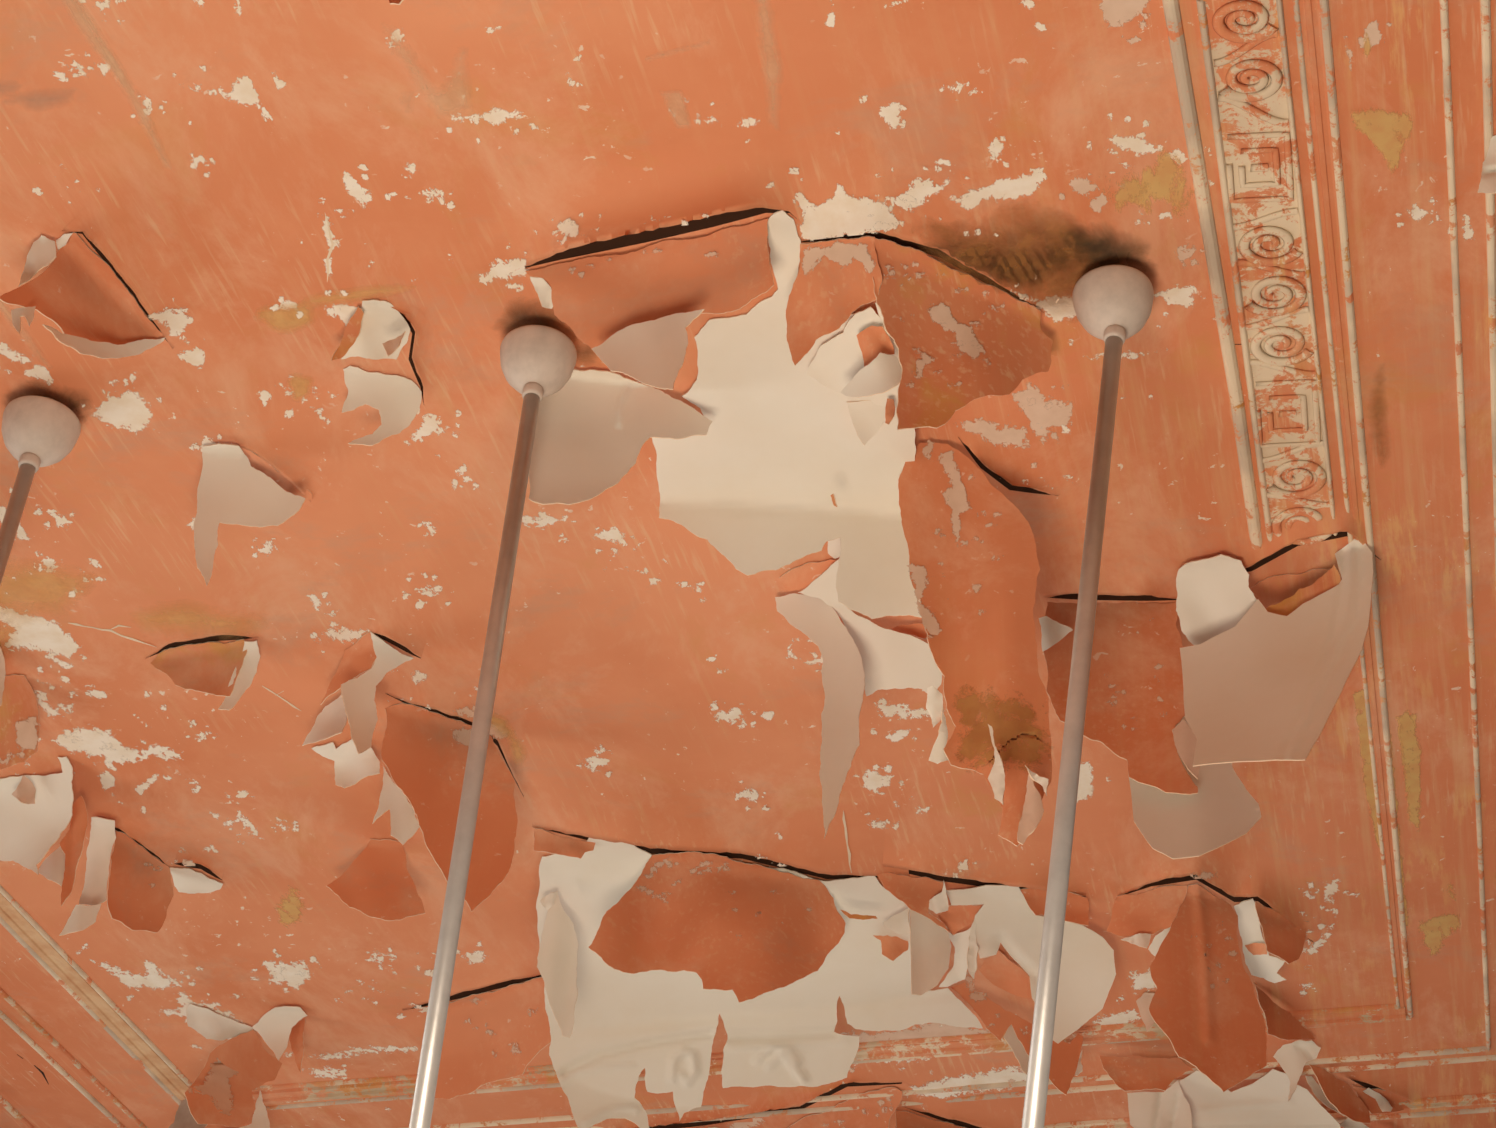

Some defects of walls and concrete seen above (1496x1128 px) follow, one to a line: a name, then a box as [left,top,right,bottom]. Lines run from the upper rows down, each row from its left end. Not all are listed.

peeling [0,232,205,435]
peeling [258,163,462,446]
flaking render [859,95,907,130]
water stain [949,223,1084,292]
flaking render [1059,113,1212,213]
flaking render [1154,245,1220,327]
peeling [187,434,312,586]
peeling [479,136,1077,846]
peeling [0,487,418,1128]
peeling [302,592,478,921]
peeling [434,723,1047,1128]
peeling [1049,539,1408,1128]